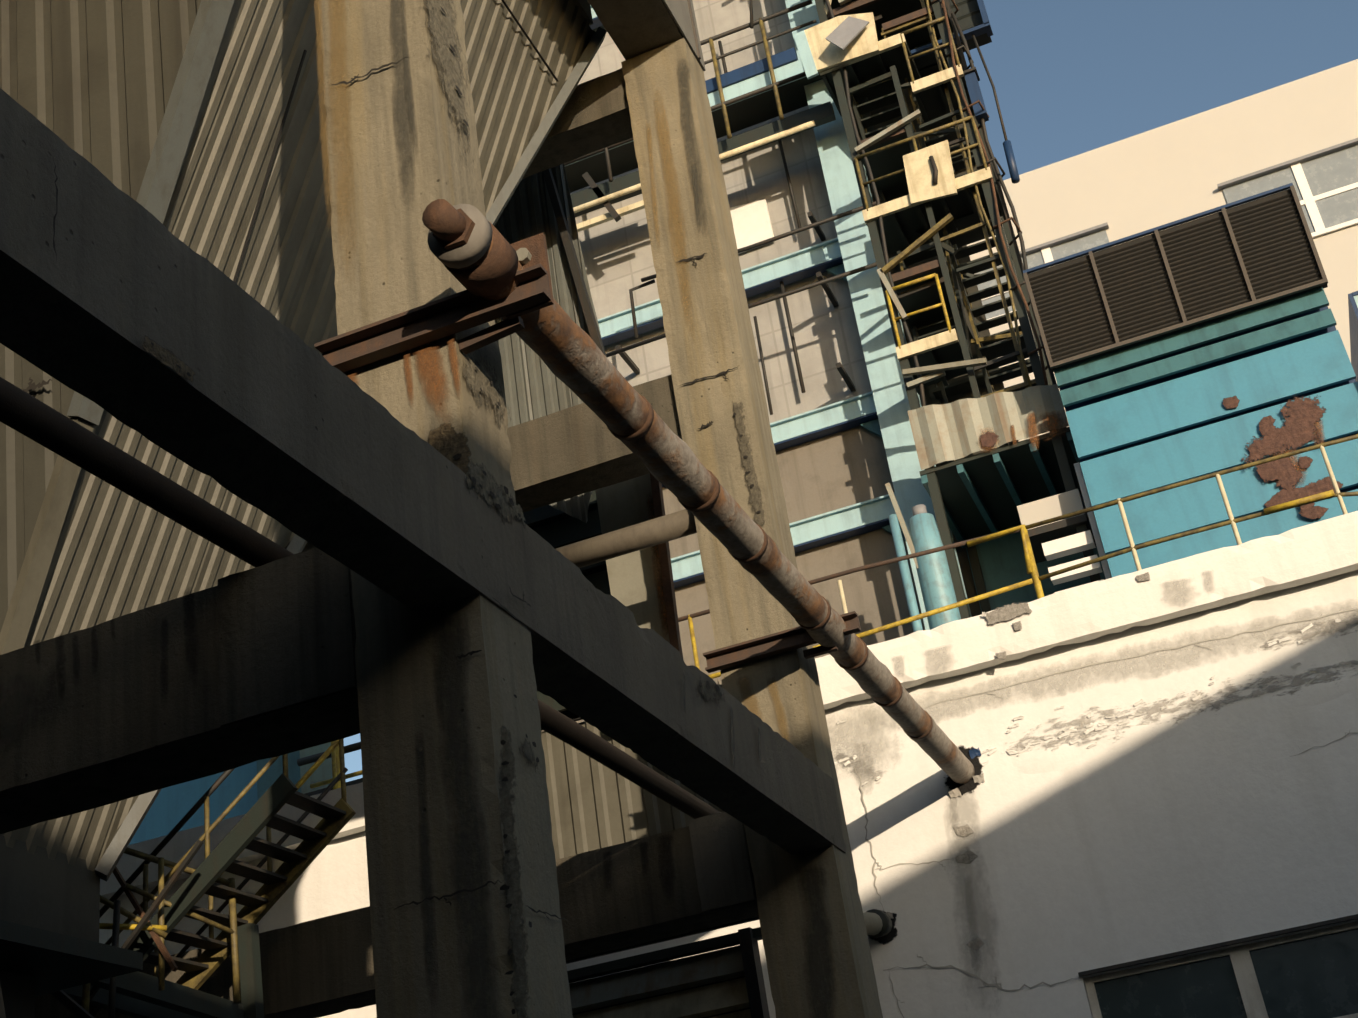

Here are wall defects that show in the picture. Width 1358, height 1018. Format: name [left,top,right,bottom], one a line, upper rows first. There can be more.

crack [329,57,409,86]
spalling [424,0,470,156]
corrosion [404,335,459,402]
spalling [428,423,526,528]
corrosion [980,412,1068,449]
corrosion [1222,396,1240,409]
corrosion [1241,395,1343,519]
peeling [1263,618,1358,650]
peeling [944,660,1358,798]
spalling [499,726,539,1018]
crack [853,764,966,907]